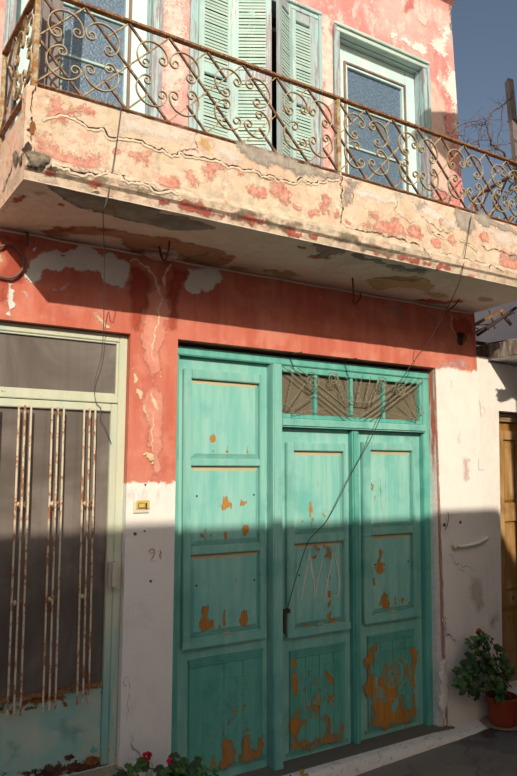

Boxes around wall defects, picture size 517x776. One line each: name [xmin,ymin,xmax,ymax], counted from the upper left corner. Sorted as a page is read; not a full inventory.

peeling [162,0,190,115]
peeling [322,14,333,112]
peeling [390,8,459,137]
peeling [24,244,131,288]
spalling [12,86,216,231]
peeling [184,266,248,294]
crack [42,113,517,271]
peeling [269,178,320,218]
peeling [297,234,451,298]
peeling [408,225,457,248]
damp [41,226,237,475]